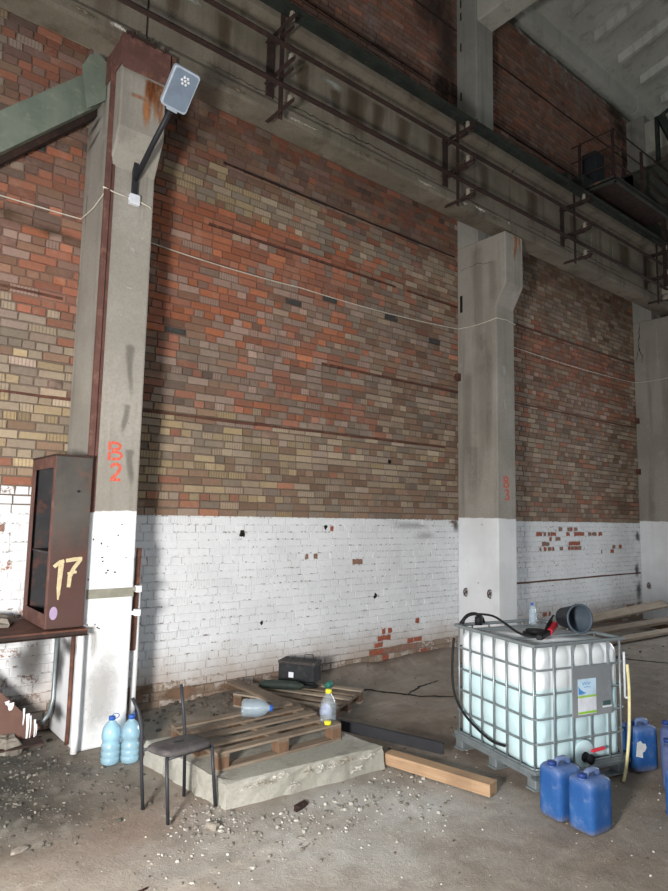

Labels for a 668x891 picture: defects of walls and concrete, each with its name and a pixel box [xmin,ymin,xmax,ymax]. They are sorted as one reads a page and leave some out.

corrosion [136,81,164,120]
peeling [536,527,602,551]
peeling [370,628,431,660]